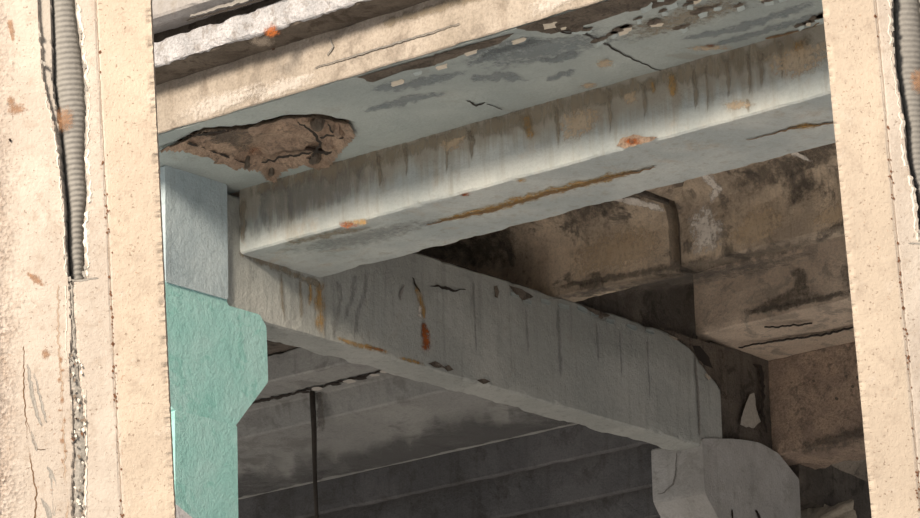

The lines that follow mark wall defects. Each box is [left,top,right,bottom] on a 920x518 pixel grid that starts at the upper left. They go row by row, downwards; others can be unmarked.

spalling [187,0,261,21]
spalling [159,114,356,183]
leakage [257,0,812,194]
peeling [357,0,722,87]
leakage [742,144,837,205]
peeling [794,13,824,31]
crack [95,0,124,518]
leakage [553,175,844,299]
crack [874,0,920,511]
corrosion [415,290,430,350]
crack [23,282,89,518]
crack [738,322,854,433]